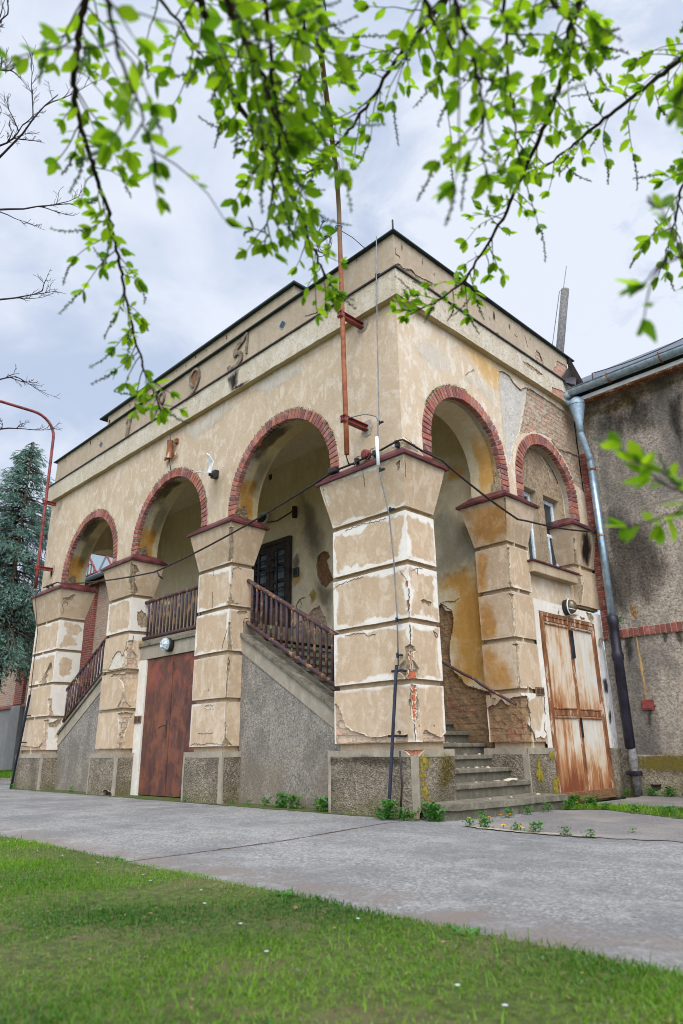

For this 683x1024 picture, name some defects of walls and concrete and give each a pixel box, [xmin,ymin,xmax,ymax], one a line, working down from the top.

spalling [491,361,583,530]
spalling [108,640,138,749]
spalling [316,551,333,588]
spalling [335,547,548,756]
crack [401,567,484,691]